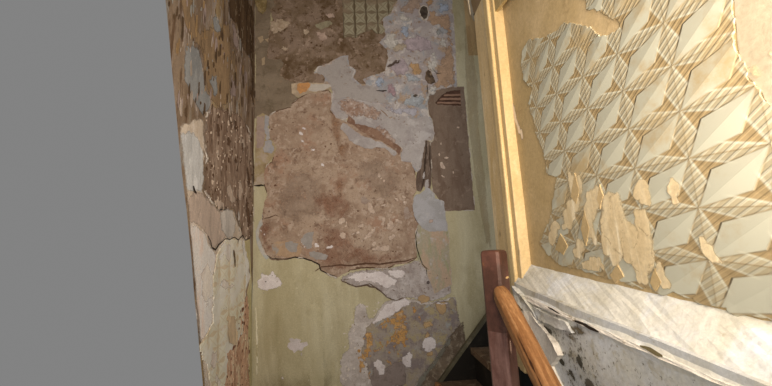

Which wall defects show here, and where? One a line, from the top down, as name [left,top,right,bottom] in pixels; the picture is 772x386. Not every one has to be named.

peeling [467,0,481,15]
spalling [168,0,475,386]
peeling [506,276,575,386]